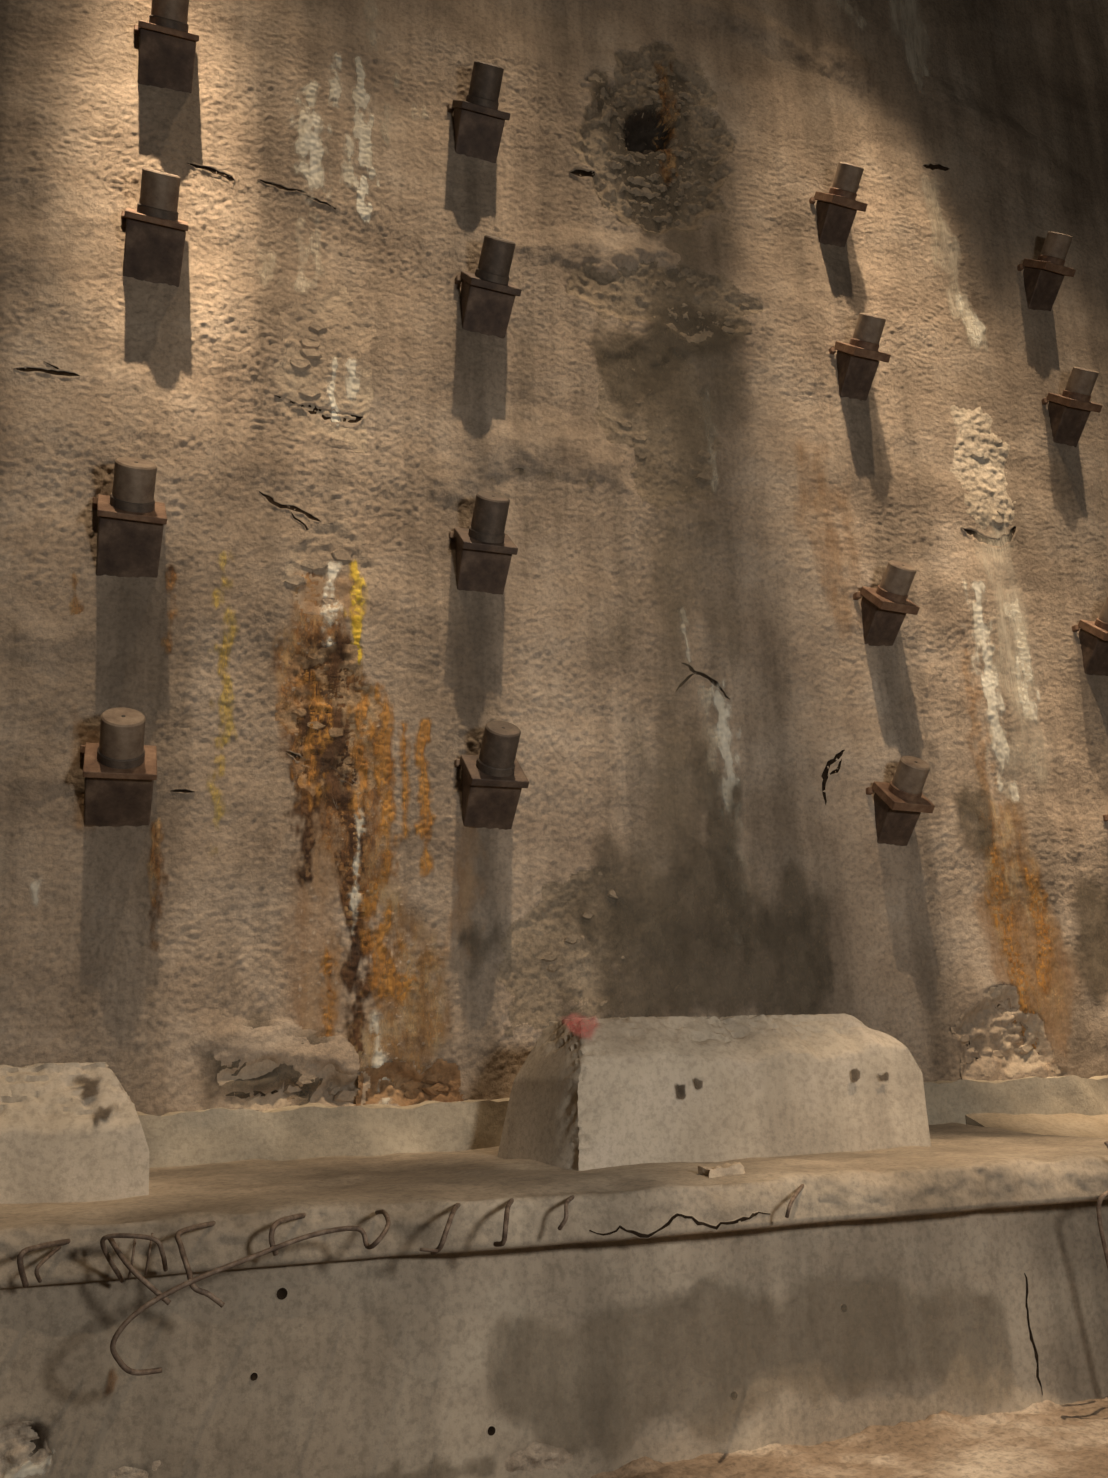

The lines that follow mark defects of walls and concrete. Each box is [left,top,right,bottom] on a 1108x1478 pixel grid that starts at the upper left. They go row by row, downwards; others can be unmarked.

leakage [295,54,388,221]
spalling [572,41,735,236]
leakage [956,582,1039,851]
rust [275,573,448,1104]
spalling [17,1239,71,1288]
spalling [100,1209,391,1376]
spalling [420,1203,461,1255]
spalling [493,1198,514,1247]
spalling [0,1419,52,1478]